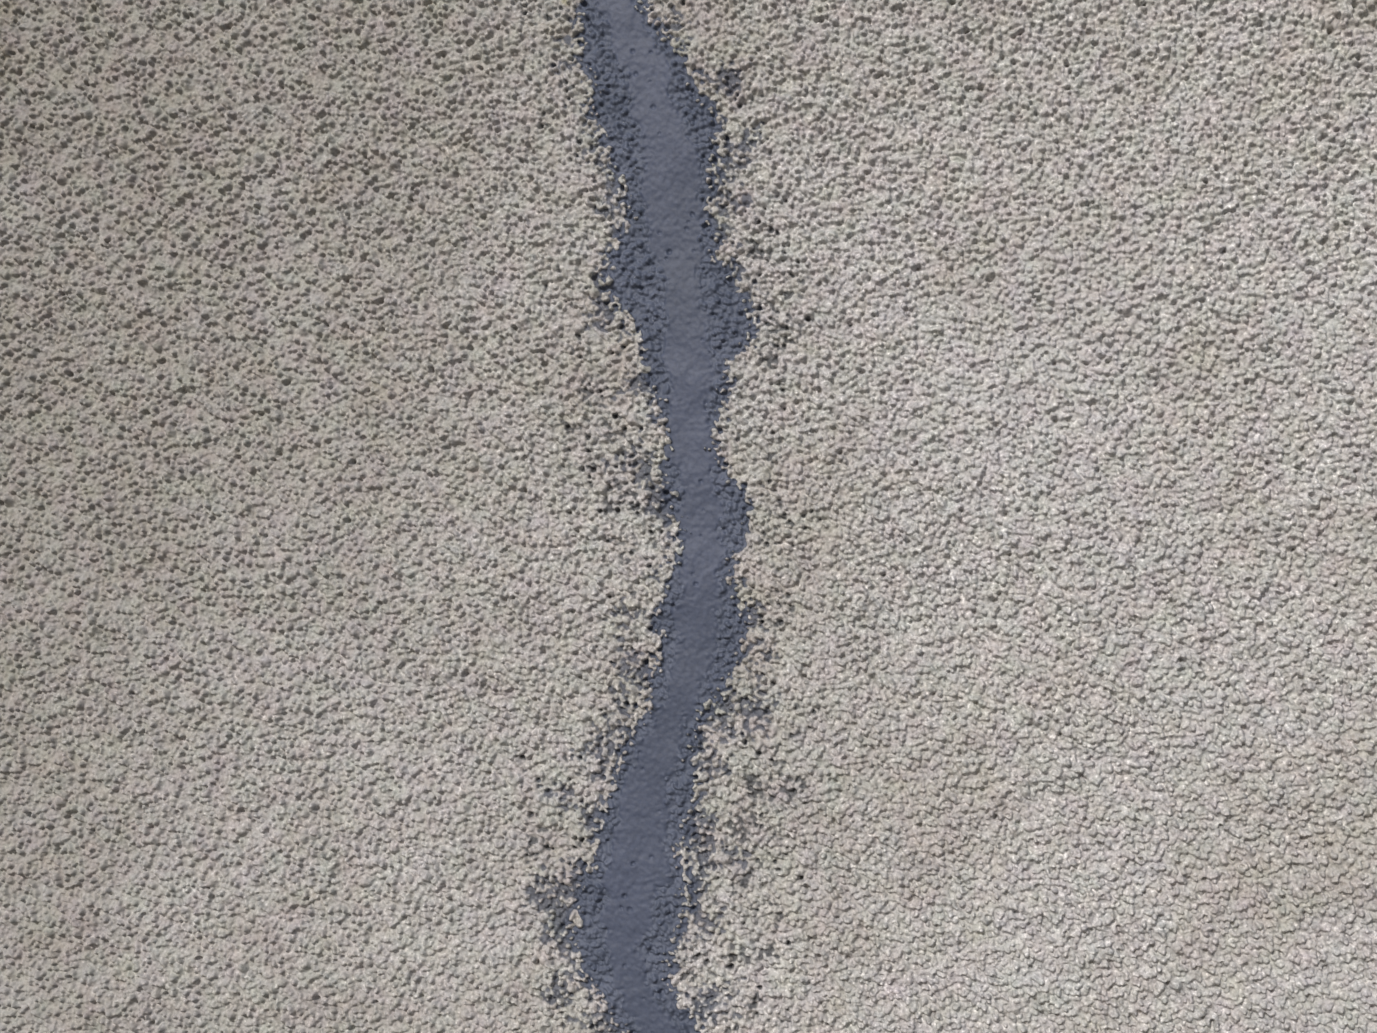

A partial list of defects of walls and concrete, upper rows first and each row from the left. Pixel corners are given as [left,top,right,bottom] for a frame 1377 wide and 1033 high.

crack [514,0,821,1033]